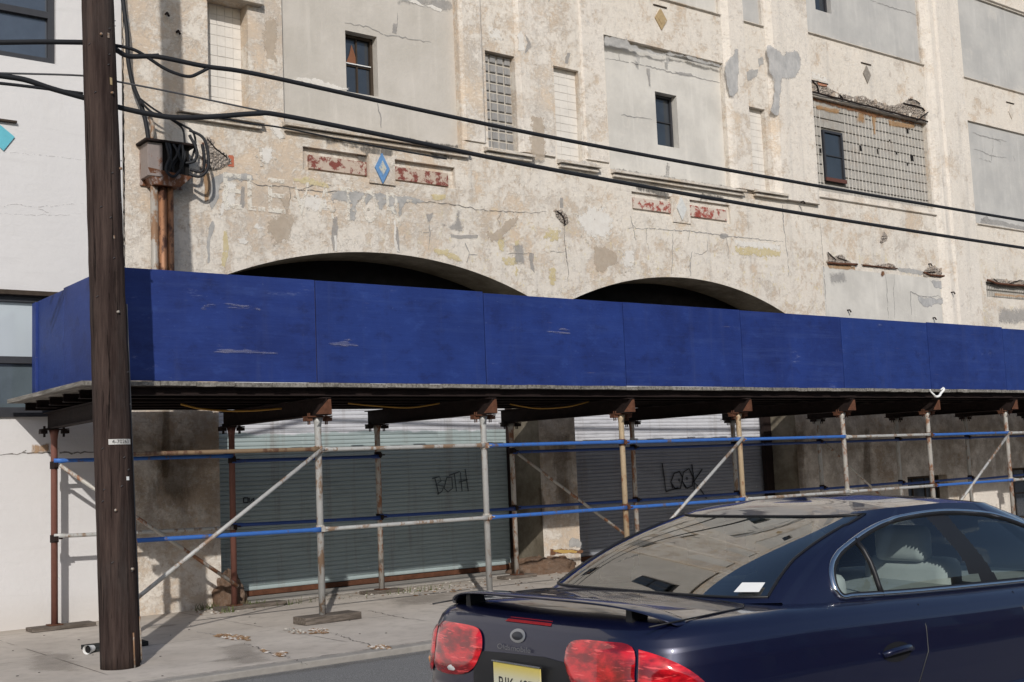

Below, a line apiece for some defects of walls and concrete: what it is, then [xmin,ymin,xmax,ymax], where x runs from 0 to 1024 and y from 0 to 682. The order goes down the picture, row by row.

crack [351,13,430,42]
spalling [811,80,929,125]
corrosion [858,113,914,134]
peeling [254,176,446,244]
peeling [487,217,519,276]
peeling [544,198,636,272]
spalling [826,252,898,276]
spalling [923,265,945,277]
spalling [987,278,1024,298]
crack [2,448,94,456]